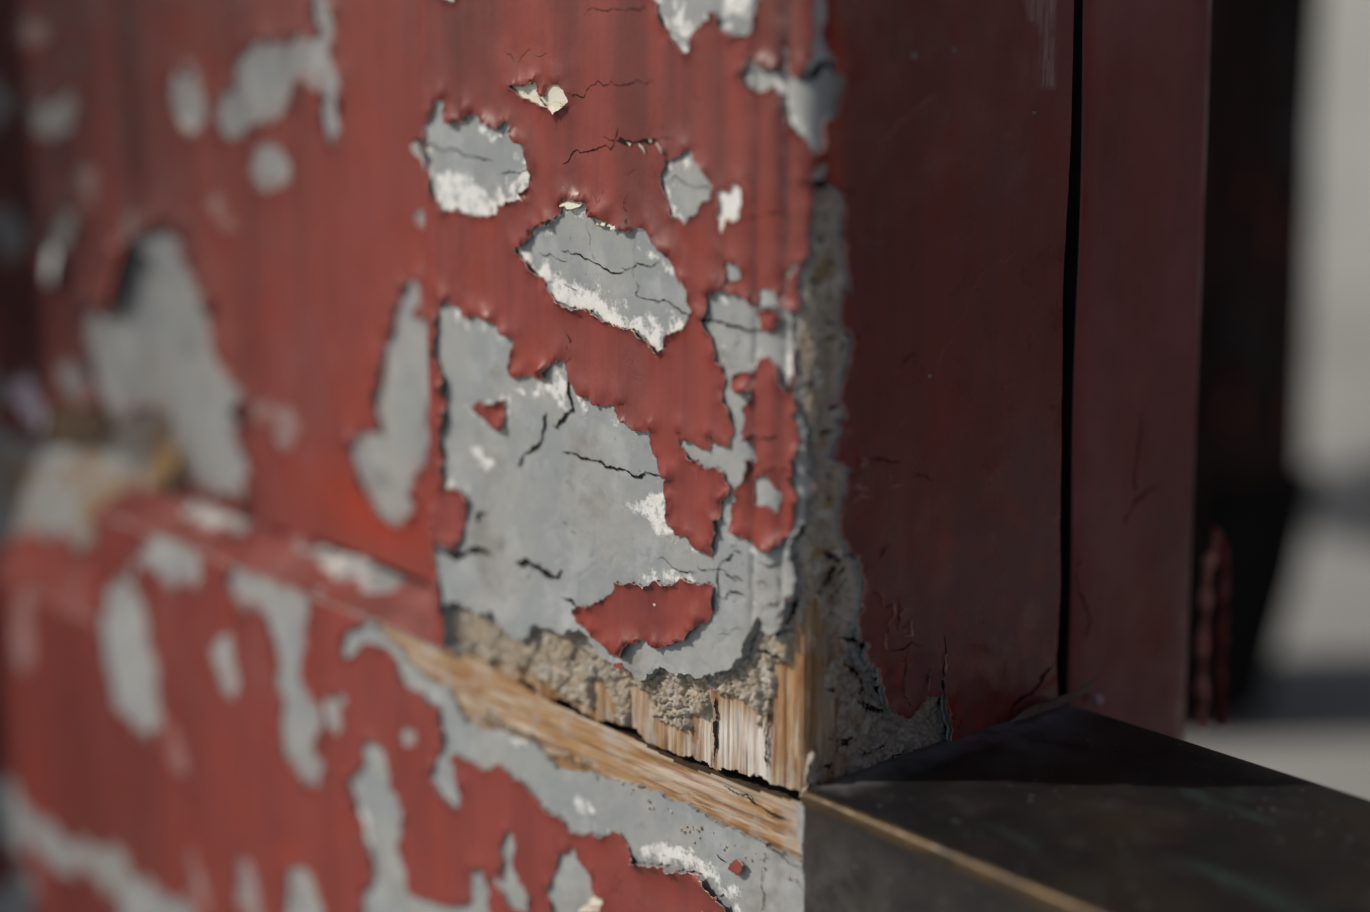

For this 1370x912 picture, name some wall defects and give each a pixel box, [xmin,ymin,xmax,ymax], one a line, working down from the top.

peeling [32,87,74,139]
peeling [170,0,340,192]
peeling [0,227,300,551]
peeling [342,0,945,912]
peeling [293,538,406,594]
peeling [101,532,200,776]
peeling [211,633,239,698]
peeling [228,565,347,786]
crack [712,666,800,822]
peeling [0,767,194,912]
peeling [234,856,261,912]
peeling [286,864,324,912]